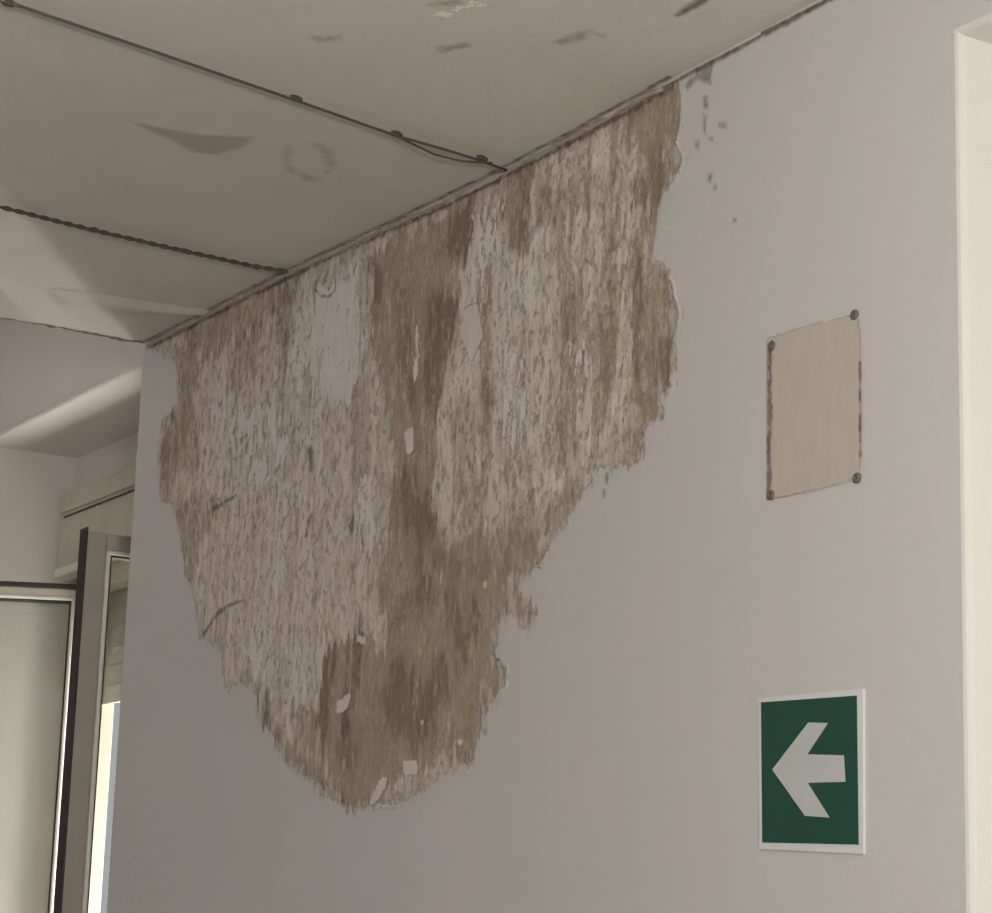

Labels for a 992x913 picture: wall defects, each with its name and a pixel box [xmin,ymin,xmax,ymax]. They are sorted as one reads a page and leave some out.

peeling [152,67,711,816]